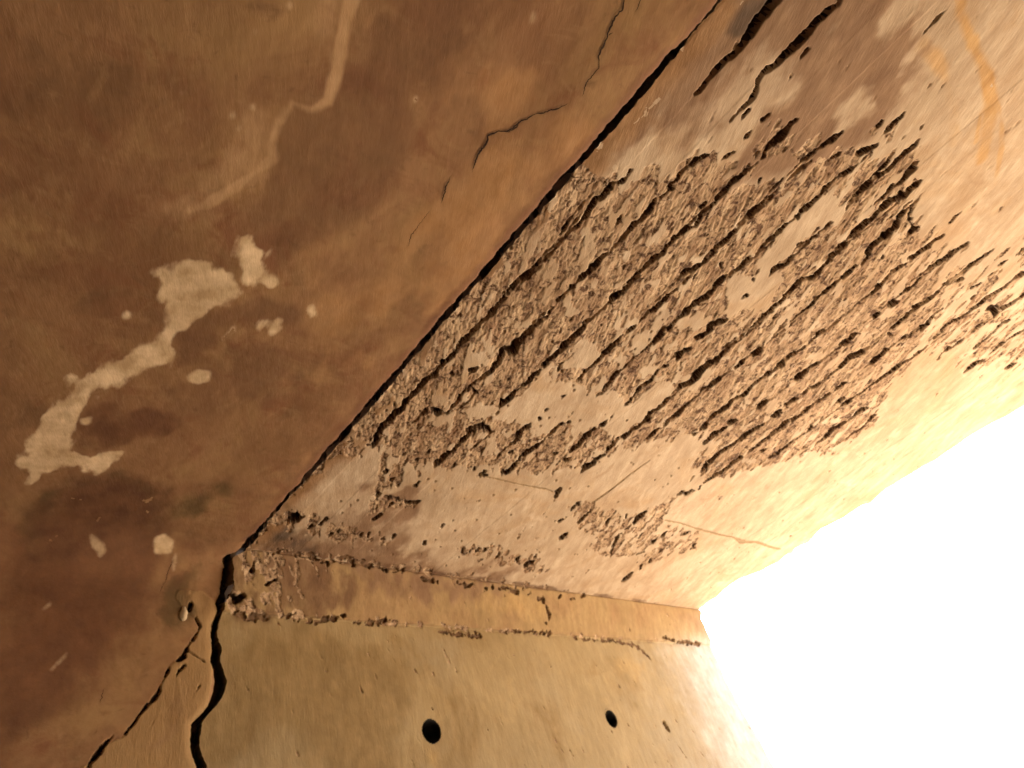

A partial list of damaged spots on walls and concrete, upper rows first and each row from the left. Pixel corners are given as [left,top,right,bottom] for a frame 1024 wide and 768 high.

crack [409,0,641,242]
leakage [483,0,972,267]
leakage [0,0,679,768]
spalling [424,252,606,414]
spalling [581,337,735,473]
spalling [609,151,749,302]
spalling [634,167,852,350]
spalling [679,349,924,495]
spalling [750,141,917,327]
spalling [872,242,1024,370]
spalling [226,547,586,628]
crack [87,617,220,768]